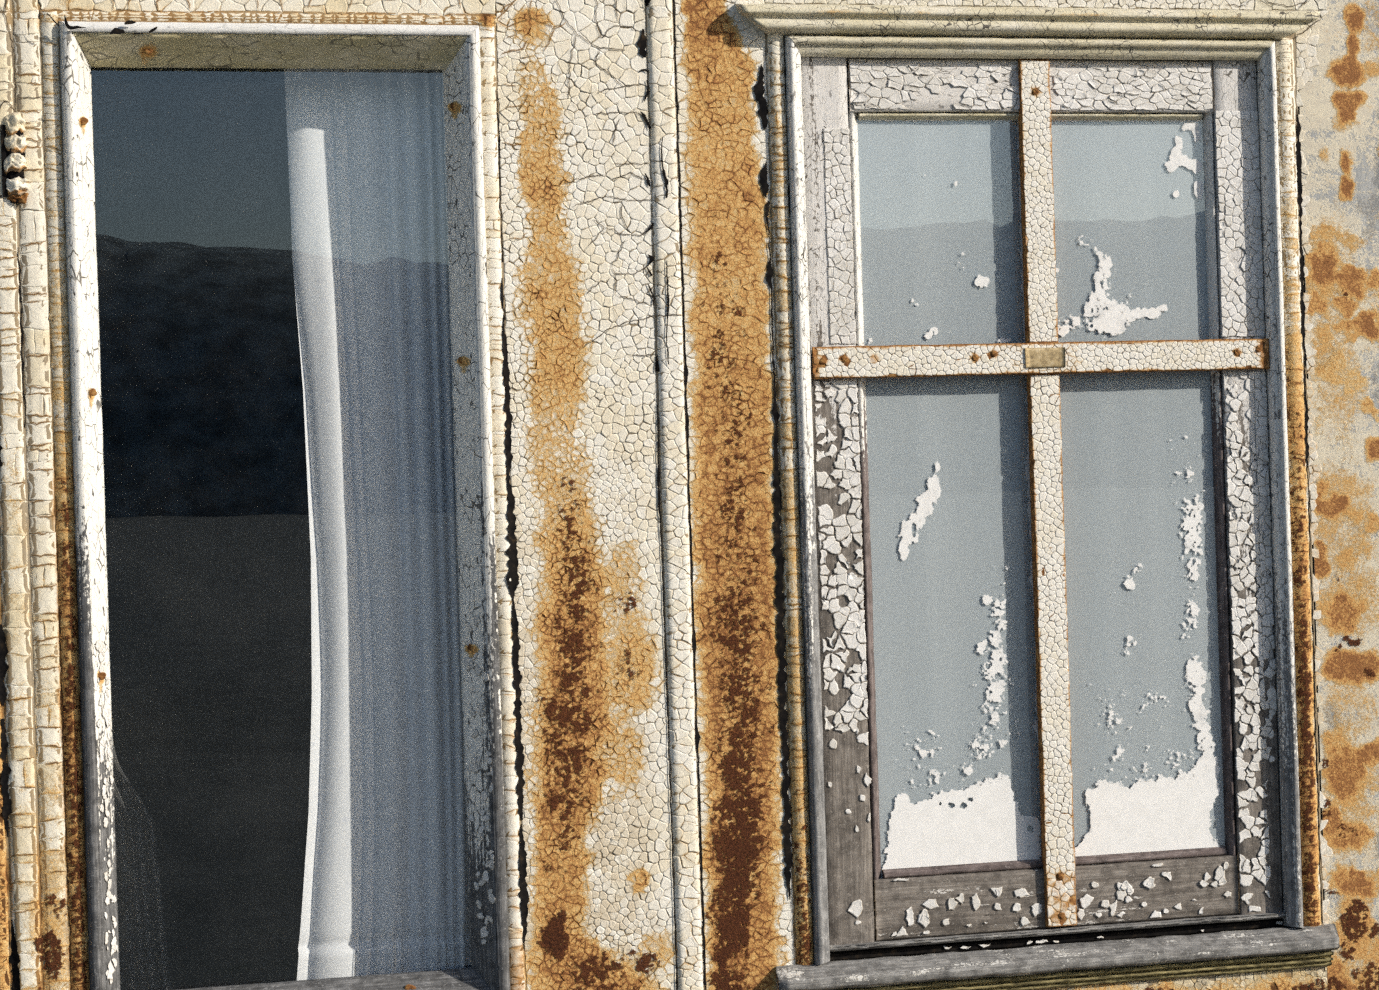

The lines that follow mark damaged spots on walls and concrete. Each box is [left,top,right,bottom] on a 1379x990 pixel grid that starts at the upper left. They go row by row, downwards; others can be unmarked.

crack [0,0,65,990]
corrosion [0,0,90,990]
peeling [95,640,118,984]
crack [47,0,190,35]
corrosion [475,5,676,990]
crack [496,0,706,990]
corrosion [678,0,813,990]
peeling [814,380,869,749]
peeling [891,887,1059,945]
peeling [1075,371,1277,932]
corrosion [1052,2,1379,990]
crack [1296,107,1323,923]